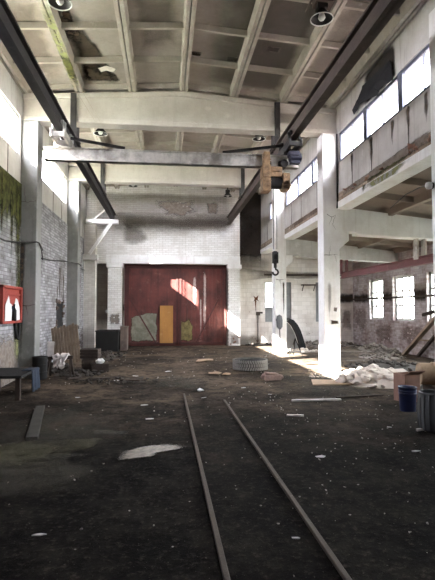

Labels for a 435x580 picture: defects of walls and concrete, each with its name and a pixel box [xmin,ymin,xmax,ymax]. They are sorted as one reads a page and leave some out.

leakage [58,10,73,22]
leakage [61,57,77,78]
leakage [64,30,116,81]
leakage [365,46,394,83]
spalling [343,132,431,194]
leakage [368,151,415,182]
leakage [340,294,368,303]